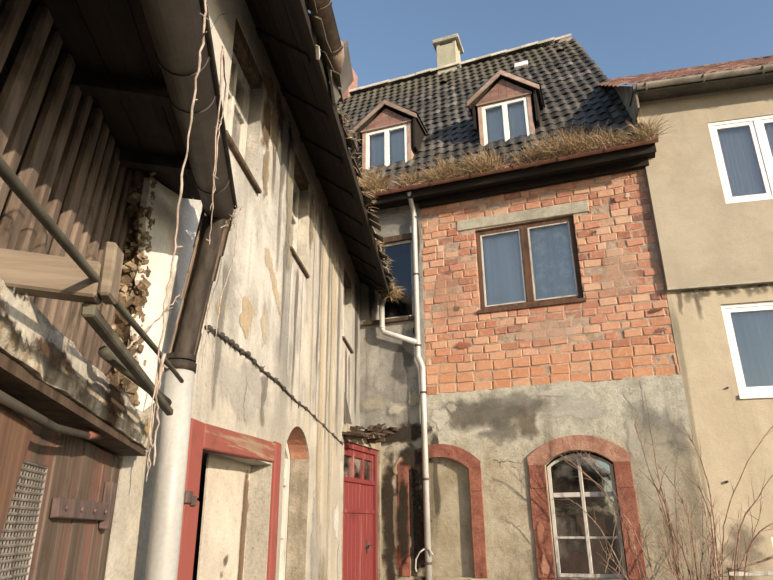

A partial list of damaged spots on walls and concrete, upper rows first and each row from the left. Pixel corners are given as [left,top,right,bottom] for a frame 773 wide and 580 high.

peeling [262,71,279,196]
spalling [0,288,97,384]
peeling [240,296,268,342]
peeling [265,249,282,319]
leakage [273,95,376,580]
leakage [367,345,415,392]
leakage [677,284,773,313]
spalling [107,386,153,434]
leakage [450,394,541,441]
leakage [381,423,441,580]